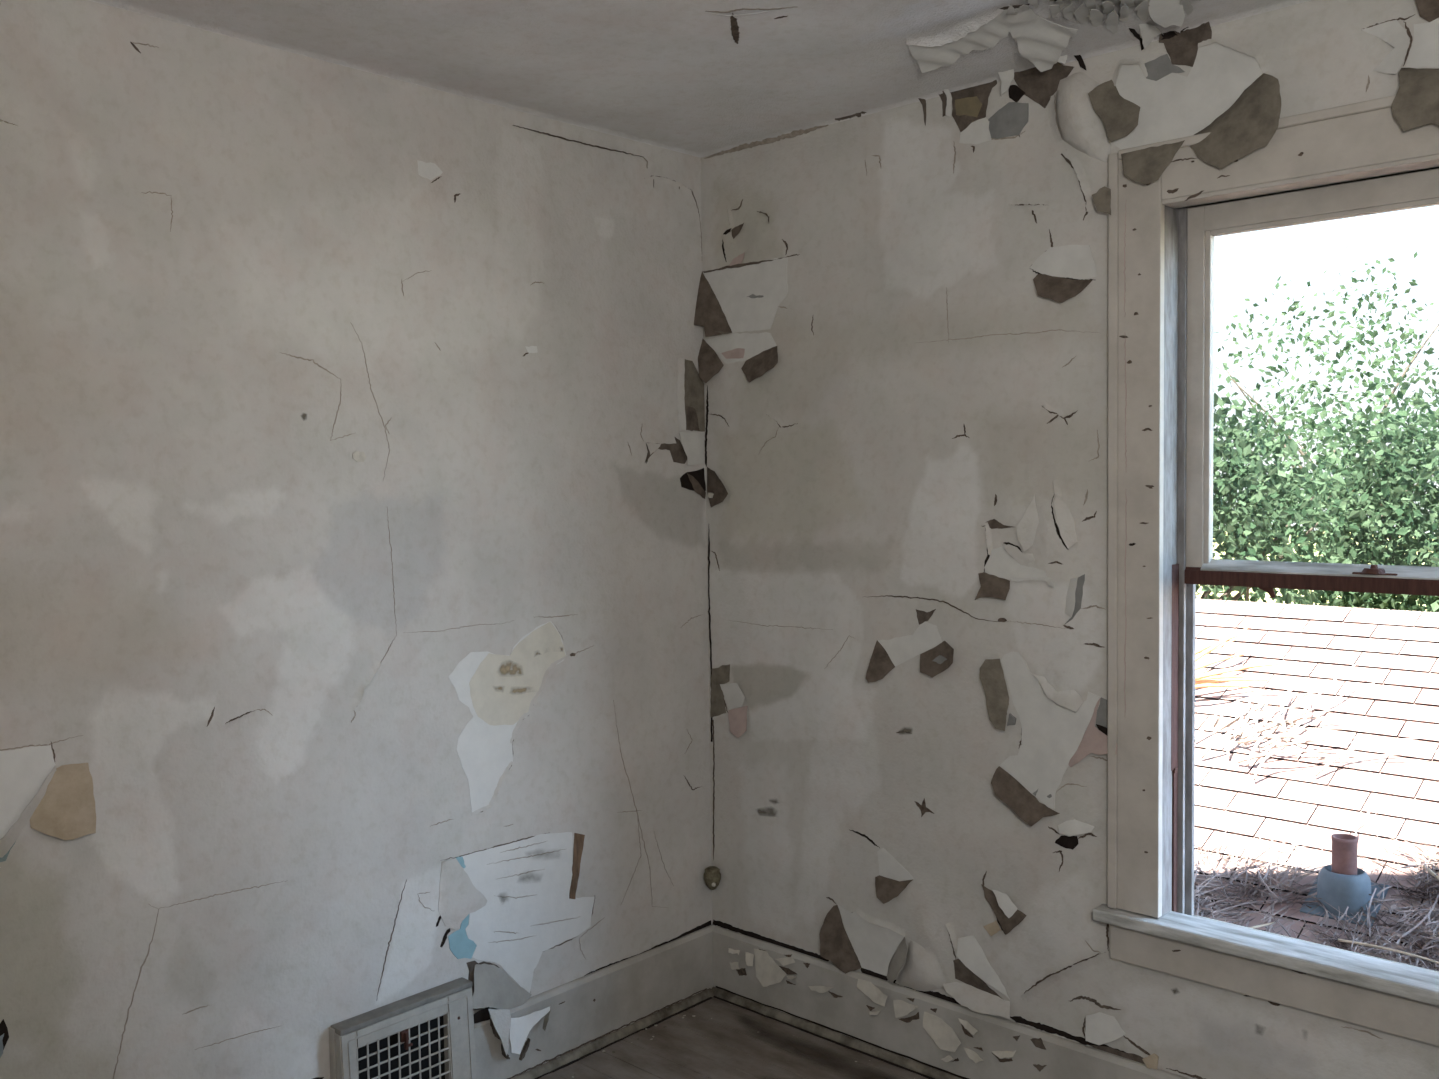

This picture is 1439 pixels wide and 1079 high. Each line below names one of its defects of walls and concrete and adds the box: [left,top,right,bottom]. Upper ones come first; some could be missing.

peeling [908,0,1281,185]
peeling [1361,0,1439,132]
peeling [694,254,800,383]
crack [280,322,578,723]
peeling [628,427,728,507]
peeling [866,609,954,683]
peeling [975,479,1106,629]
peeling [0,745,96,862]
peeling [980,652,1117,871]
crack [113,880,288,1079]
peeling [436,832,604,1061]
peeling [728,829,1047,1071]